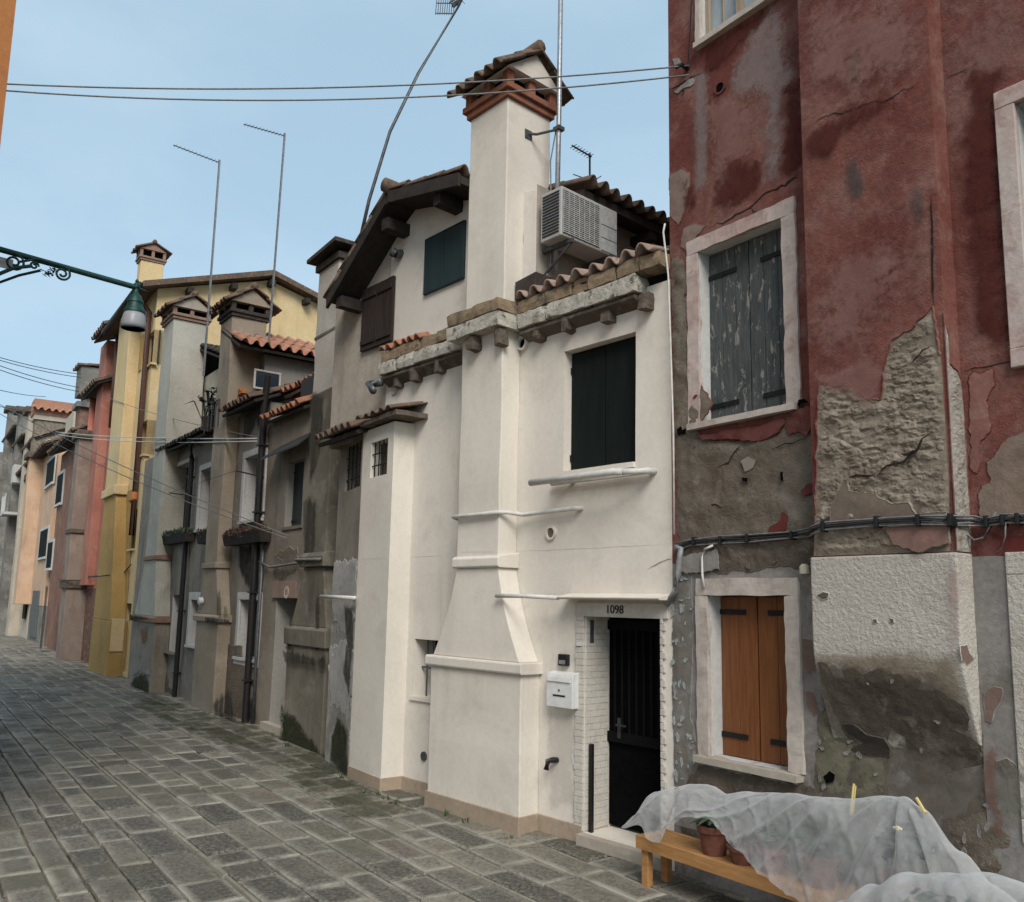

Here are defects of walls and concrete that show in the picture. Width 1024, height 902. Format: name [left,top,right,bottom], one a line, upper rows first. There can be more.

water stain [684,11,885,206]
crack [814,81,920,123]
crack [711,172,800,228]
crack [928,197,936,305]
crack [848,432,934,478]
spalling [668,167,1024,850]
water stain [343,606,353,694]